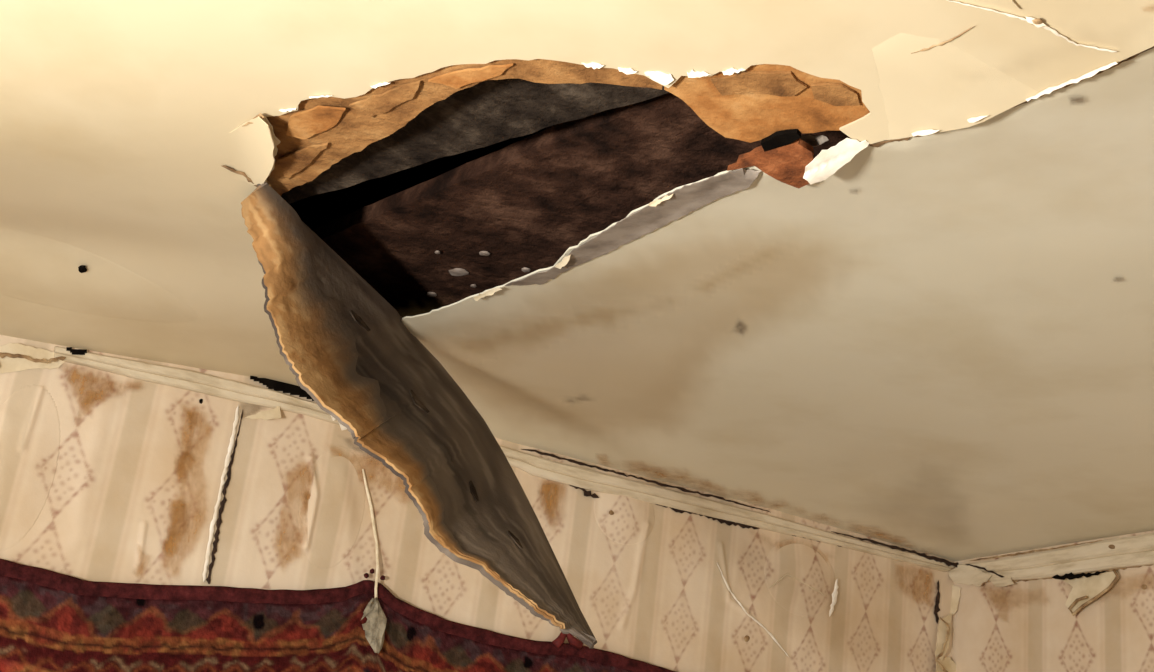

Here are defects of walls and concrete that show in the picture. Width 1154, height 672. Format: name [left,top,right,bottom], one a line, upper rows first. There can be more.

crack [947,0,1154,123]
crack [869,129,939,147]
spalling [266,59,870,301]
crack [66,347,87,355]
damp [70,369,113,410]
crack [250,376,314,401]
crack [202,406,243,584]
damp [541,484,559,516]
damp [165,502,202,554]